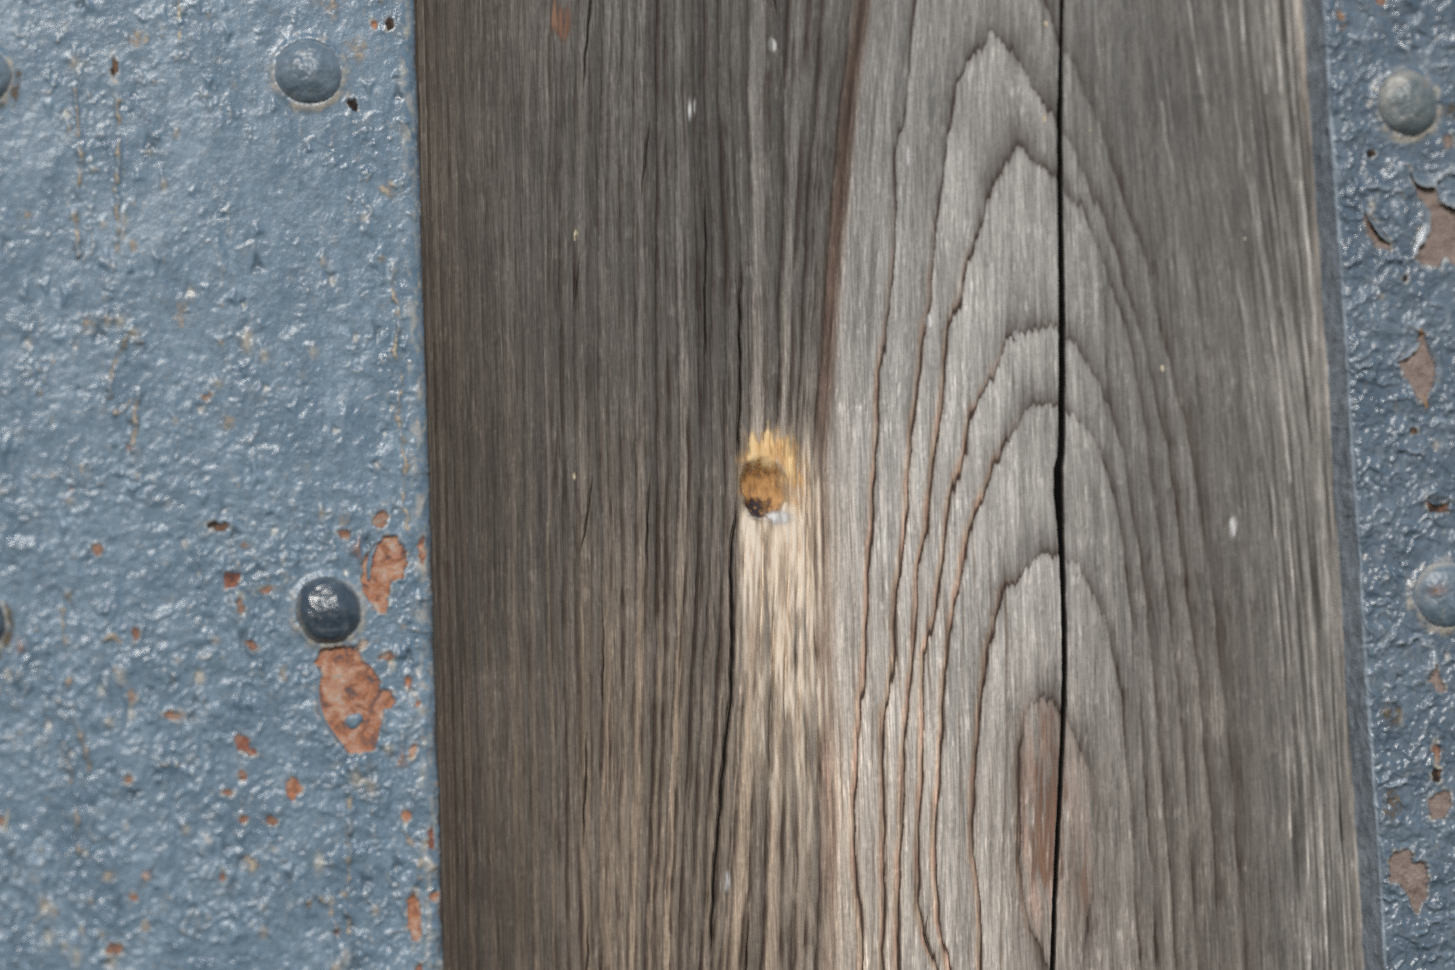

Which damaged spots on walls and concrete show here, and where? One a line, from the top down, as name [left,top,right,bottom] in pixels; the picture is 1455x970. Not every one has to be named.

peeling [1364,210,1395,251]
peeling [1403,135,1455,282]
crack [704,224,742,451]
peeling [1397,332,1442,401]
crack [1050,0,1066,970]
peeling [357,640,395,660]
crack [710,518,749,970]
peeling [1389,849,1429,914]